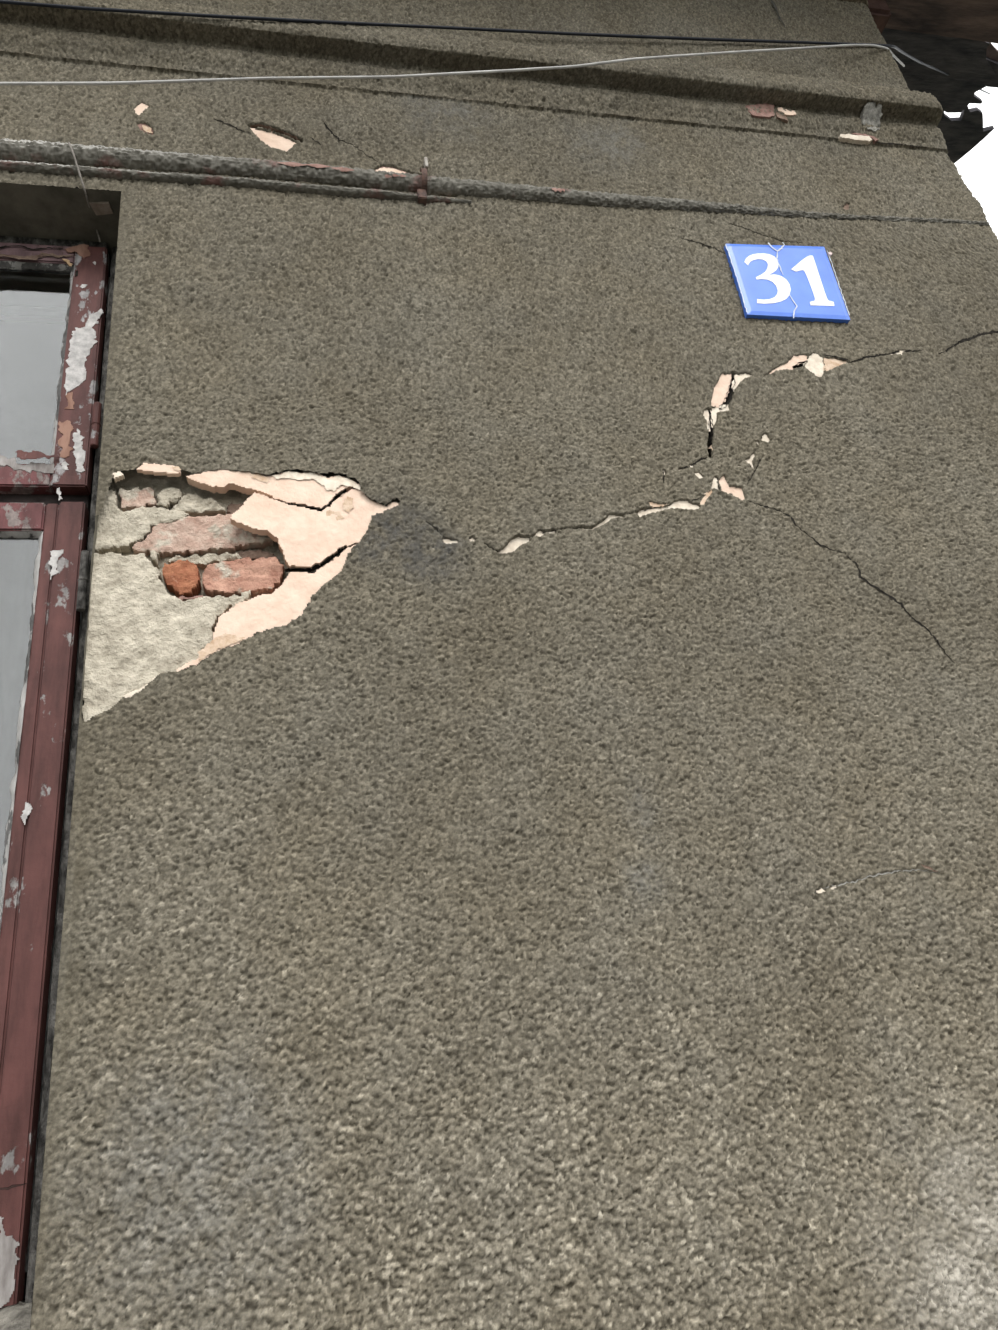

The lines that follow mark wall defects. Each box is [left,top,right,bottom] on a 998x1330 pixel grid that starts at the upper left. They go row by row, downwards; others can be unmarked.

flaking render [134,103,153,135]
flaking render [746,103,796,124]
spalling [838,102,883,146]
flaking render [250,124,354,172]
flaking render [375,166,406,178]
crack [847,330,998,363]
peeling [0,309,104,501]
crack [426,373,951,659]
peeling [48,550,64,580]
spalling [82,463,401,721]
peeling [20,802,33,825]
peeling [0,1216,20,1308]